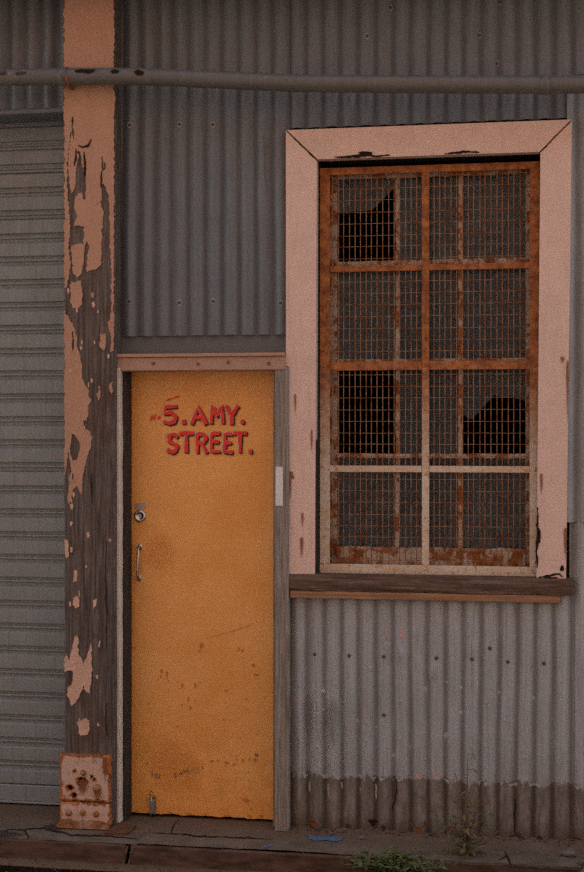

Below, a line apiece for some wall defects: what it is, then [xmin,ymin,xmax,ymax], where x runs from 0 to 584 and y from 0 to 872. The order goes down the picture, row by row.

peeling [63,0,119,74]
peeling [63,85,116,510]
peeling [69,565,87,609]
peeling [64,635,101,706]
peeling [77,718,99,736]
corrosion [78,779,101,798]